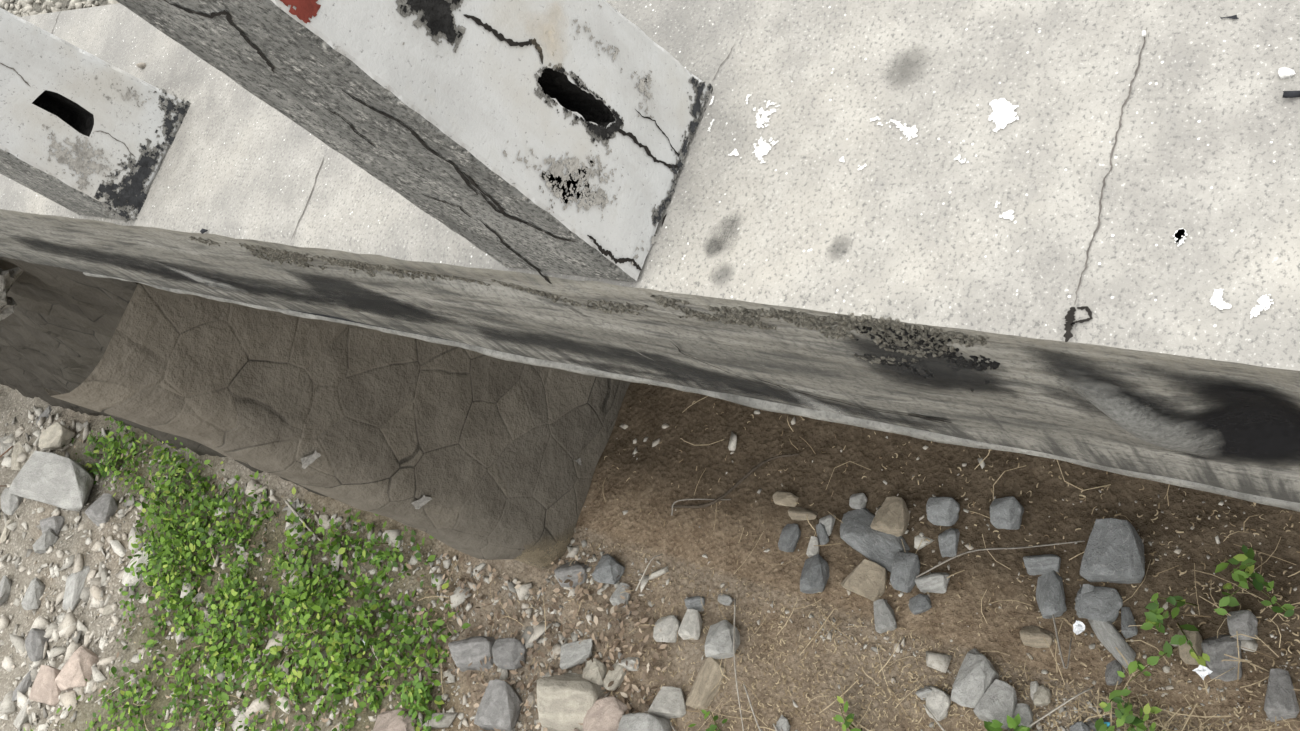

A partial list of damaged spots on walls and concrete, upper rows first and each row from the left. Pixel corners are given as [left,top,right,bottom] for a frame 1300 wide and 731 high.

crack [463,14,543,64]
peeling [503,19,654,219]
crack [618,109,681,169]
crack [1063,27,1147,342]
damp [480,330,928,428]
damp [853,339,1008,394]
damp [1042,354,1178,417]
damp [1164,375,1260,414]